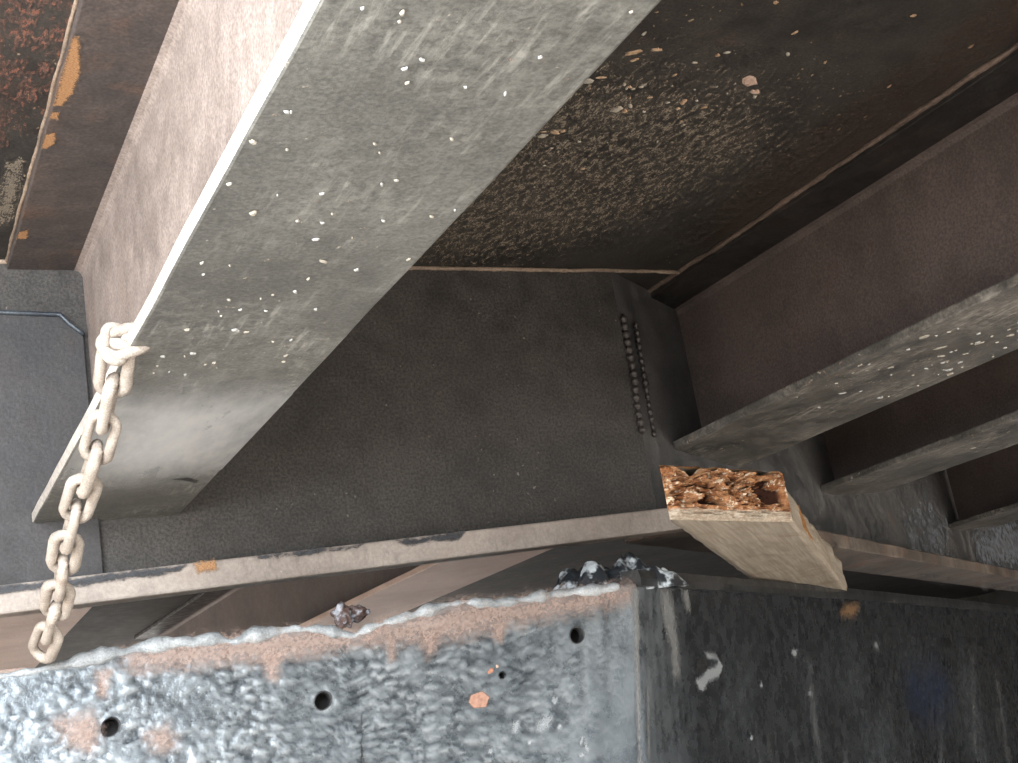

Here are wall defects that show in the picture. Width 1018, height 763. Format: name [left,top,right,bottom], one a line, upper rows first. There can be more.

corrosion [0,0,80,140]
corrosion [42,133,56,149]
peeling [469,692,489,708]